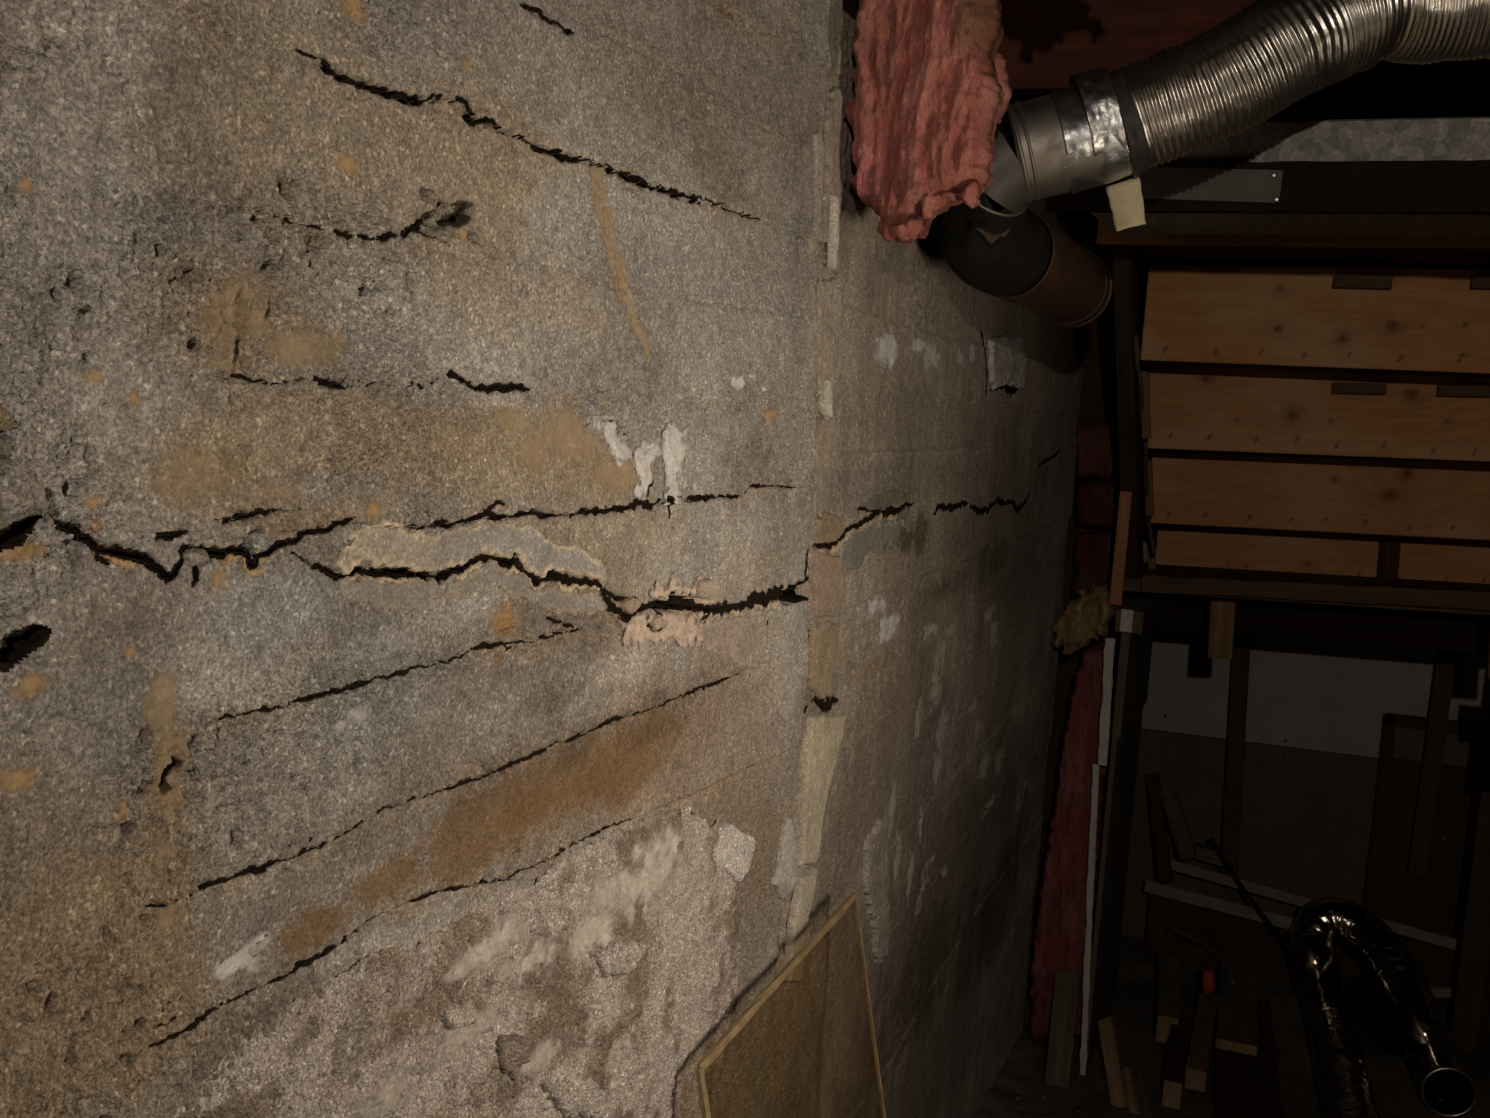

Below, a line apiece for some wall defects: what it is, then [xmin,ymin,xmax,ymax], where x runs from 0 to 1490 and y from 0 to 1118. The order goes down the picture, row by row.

crack [296,49,760,220]
crack [274,214,422,242]
damp [494,408,689,506]
spalling [0,515,43,552]
spalling [0,624,52,673]
peeling [334,519,719,651]
crack [48,446,1061,720]
crack [144,672,740,907]
peeling [713,823,755,883]
crack [149,916,375,1048]